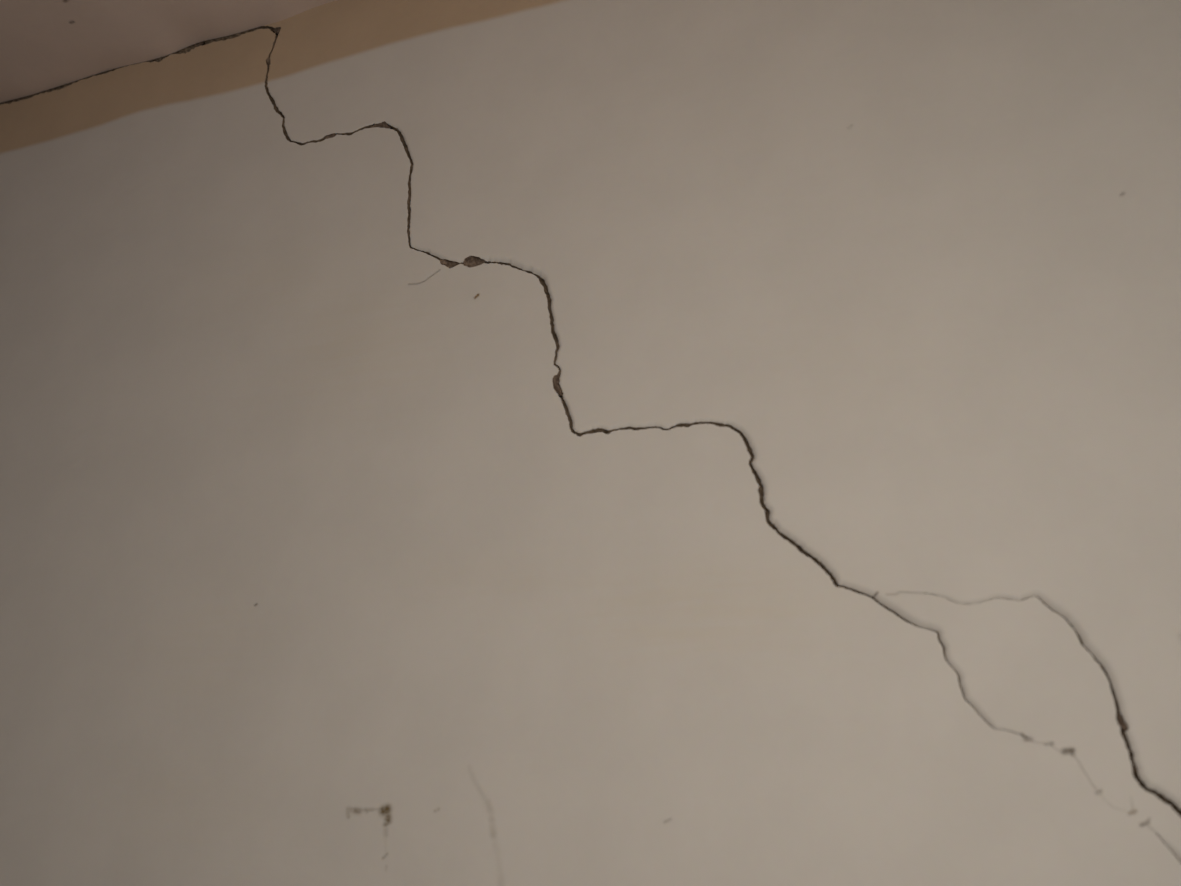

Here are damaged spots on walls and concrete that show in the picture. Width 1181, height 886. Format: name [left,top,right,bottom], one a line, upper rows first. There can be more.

crack [0,26,1025,737]
crack [925,593,1181,817]